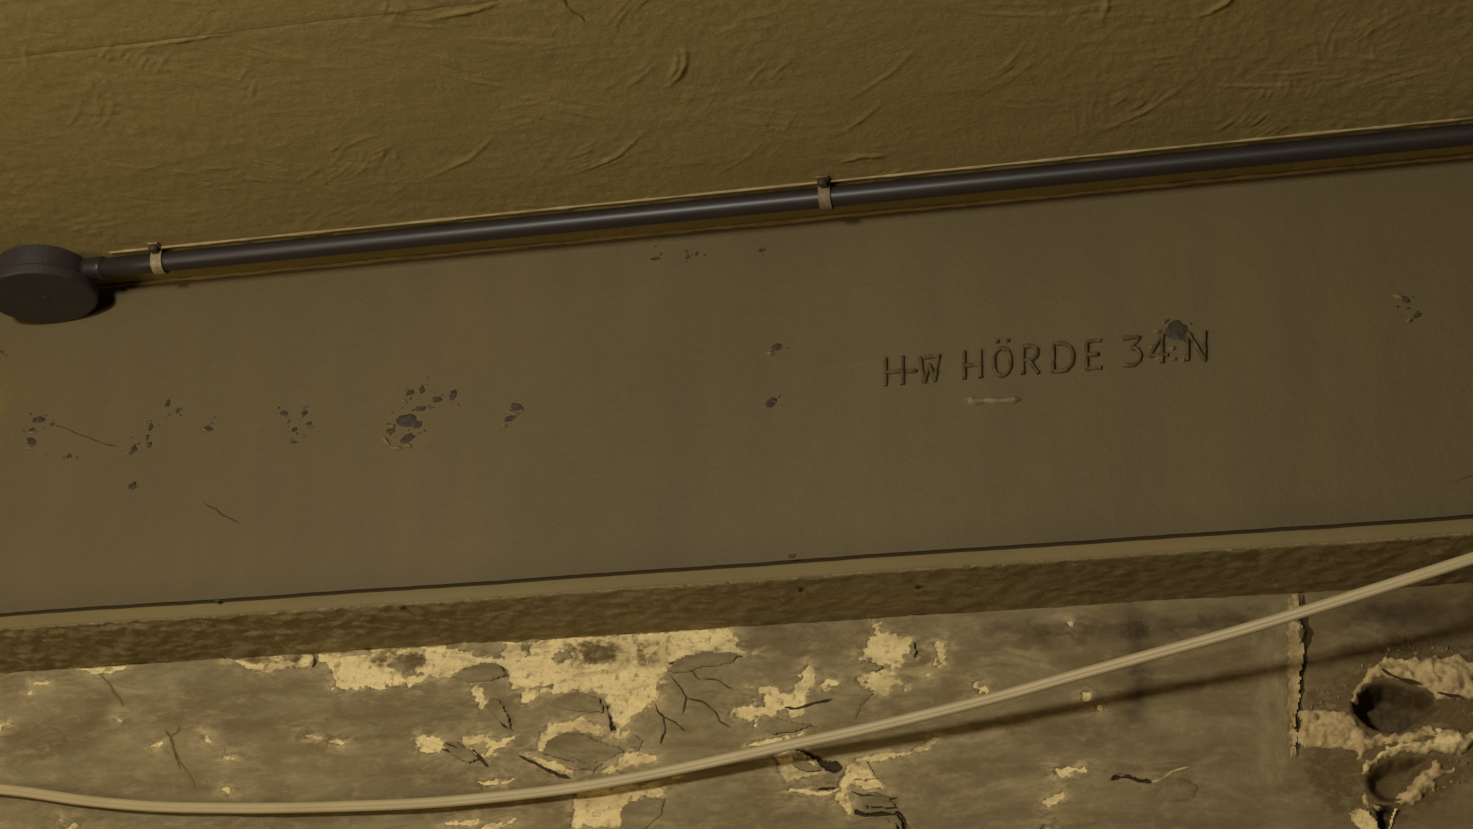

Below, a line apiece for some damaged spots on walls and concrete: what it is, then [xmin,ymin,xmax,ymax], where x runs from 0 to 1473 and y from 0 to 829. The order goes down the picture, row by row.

peeling [383,376,460,451]
peeling [81,665,126,675]
peeling [230,628,755,829]
crack [607,706,616,732]
crack [655,671,732,743]
peeling [729,664,940,829]
peeling [857,619,947,699]
spalling [1246,593,1473,829]
crack [795,749,911,829]